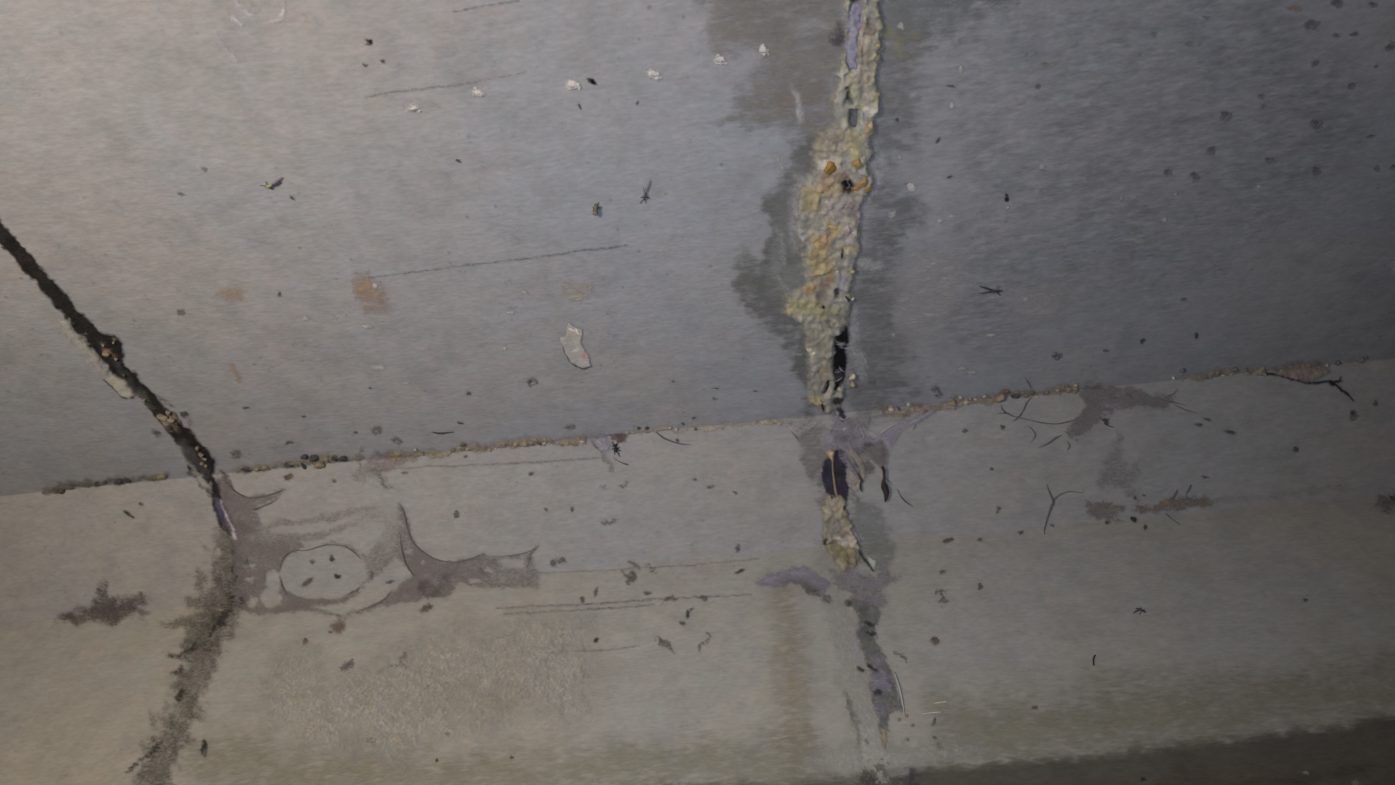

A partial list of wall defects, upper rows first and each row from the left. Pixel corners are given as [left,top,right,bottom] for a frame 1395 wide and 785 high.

leakage [712,0,971,486]
crack [0,223,249,785]
crack [821,326,865,501]
crack [1266,373,1353,400]
crack [845,598,917,785]